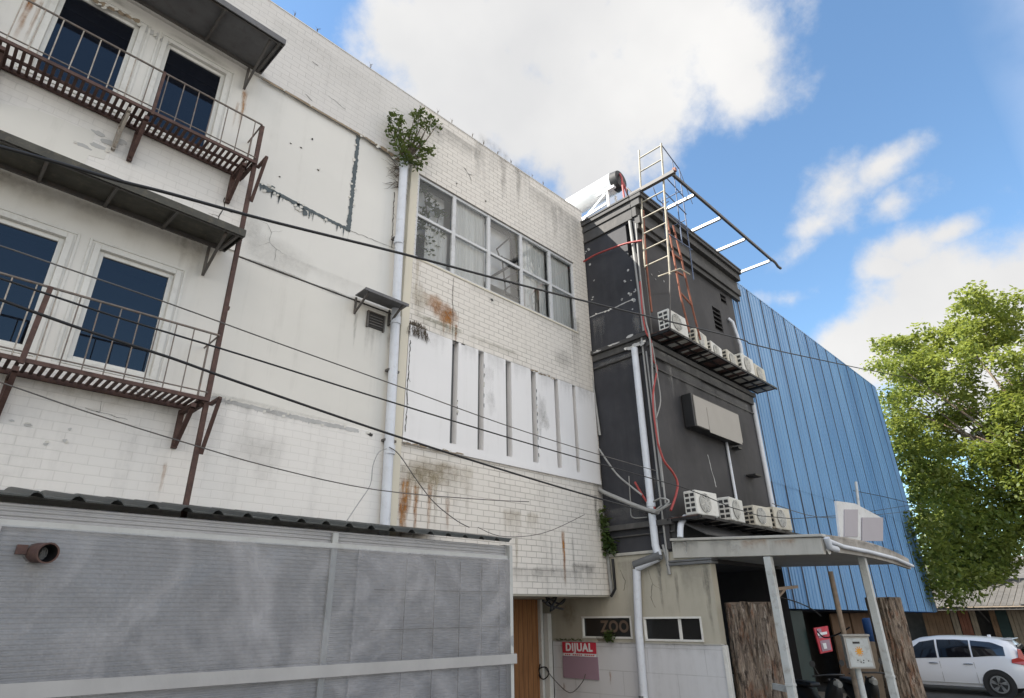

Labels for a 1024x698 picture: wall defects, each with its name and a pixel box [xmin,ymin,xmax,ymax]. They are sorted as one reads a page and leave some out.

peeling [259,78,400,234]
rust [432,298,457,335]
rust [399,481,417,534]